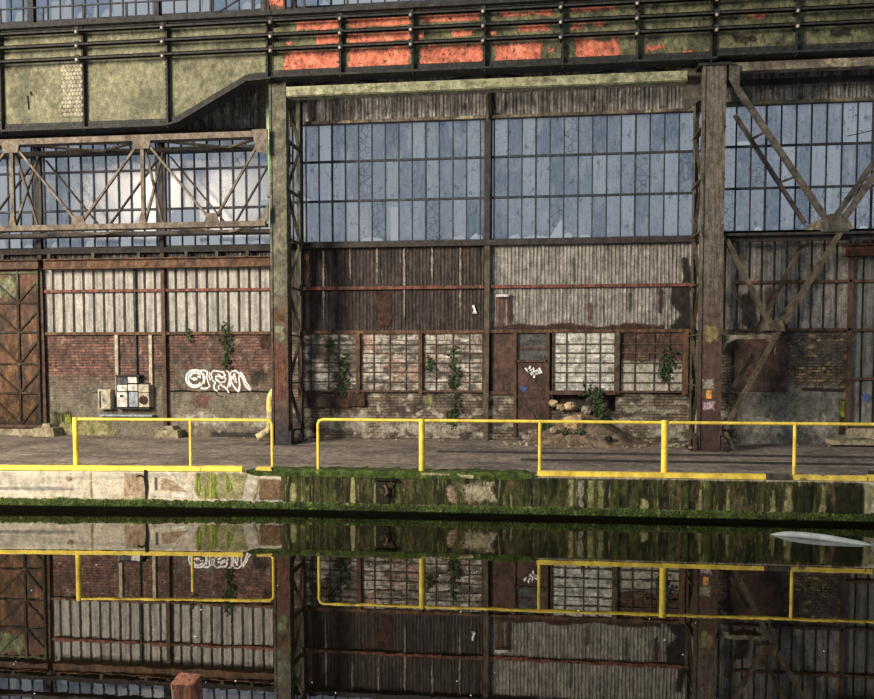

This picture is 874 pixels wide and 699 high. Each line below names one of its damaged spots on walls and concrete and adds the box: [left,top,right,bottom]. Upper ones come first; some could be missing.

peeling [283,13,483,70]
peeling [488,9,556,61]
peeling [571,6,621,57]
leakage [0,471,874,526]